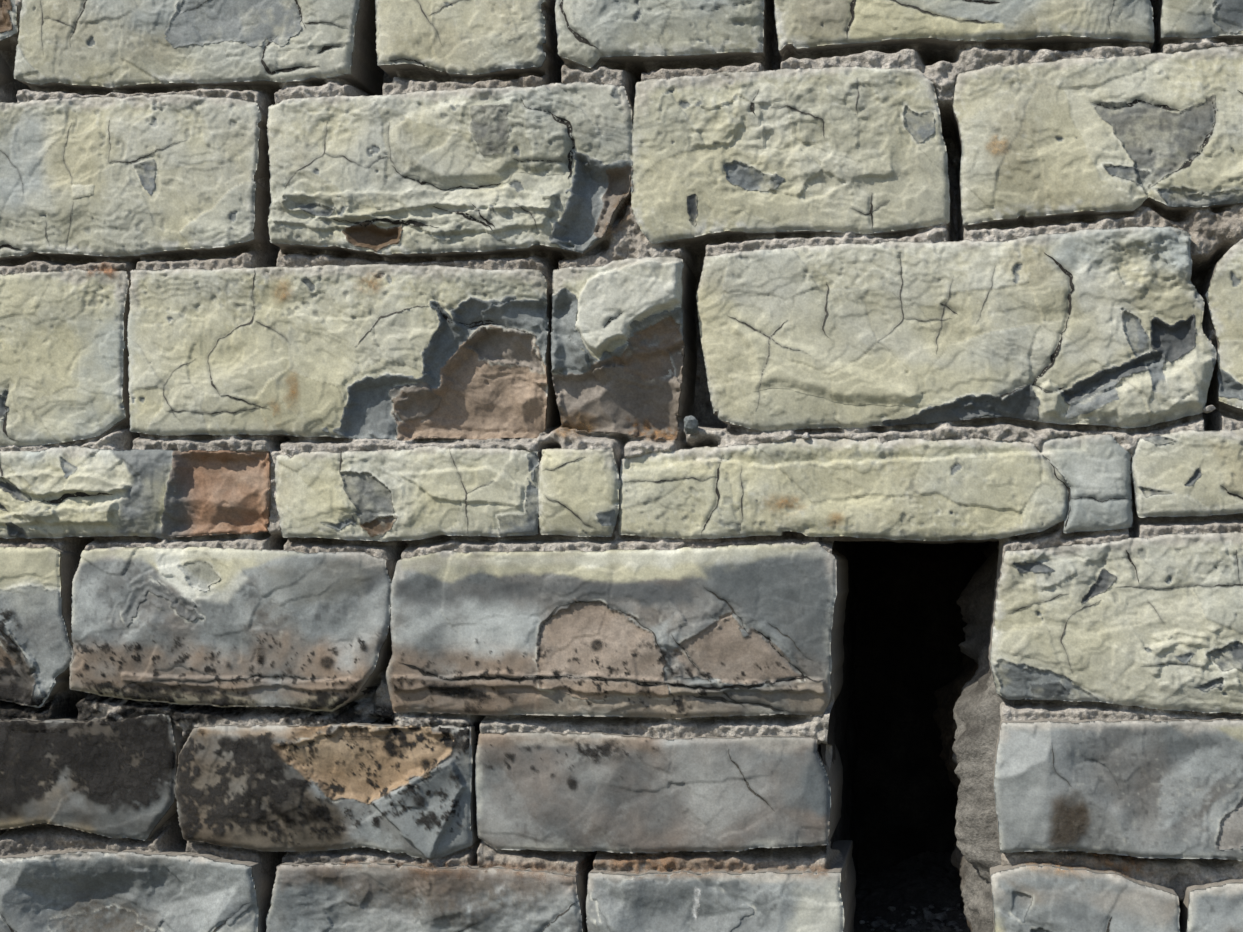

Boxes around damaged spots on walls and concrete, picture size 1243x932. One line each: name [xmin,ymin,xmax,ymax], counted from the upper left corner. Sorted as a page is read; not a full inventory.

spalling [0,0,12,33]
crack [261,0,347,74]
crack [0,127,73,251]
crack [285,124,537,230]
crack [517,103,575,178]
spalling [321,258,699,537]
crack [728,316,793,411]
crack [985,253,1074,403]
spalling [161,450,270,539]
spalling [0,585,74,706]
spalling [535,599,803,700]
crack [1013,551,1243,647]